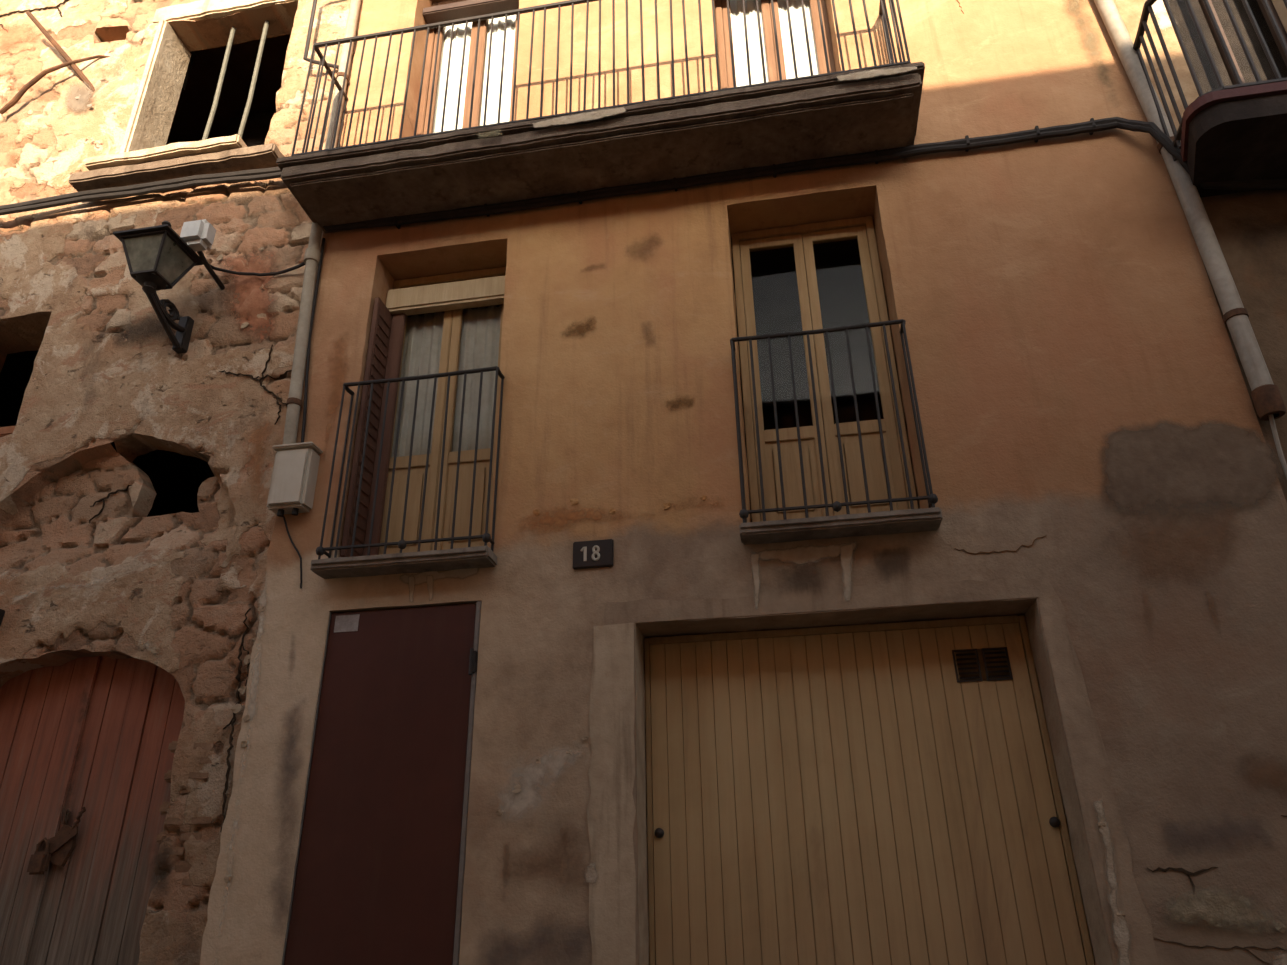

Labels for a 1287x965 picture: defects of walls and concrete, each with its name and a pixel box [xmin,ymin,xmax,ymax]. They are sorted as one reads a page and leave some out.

crack [219,345,292,425]
crack [955,536,1045,554]
spalling [1094,800,1131,965]
crack [1148,867,1218,895]
crack [1156,938,1286,965]